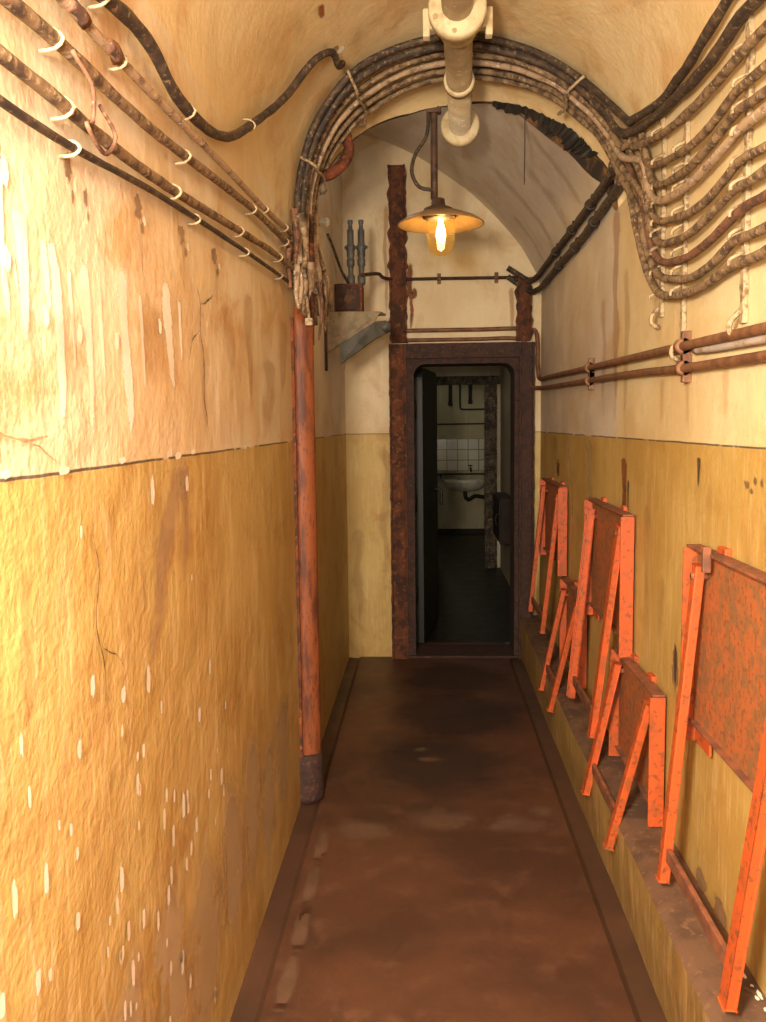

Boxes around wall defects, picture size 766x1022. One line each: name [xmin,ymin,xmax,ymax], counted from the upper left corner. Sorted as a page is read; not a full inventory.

leakage [0,209,29,341]
leakage [40,240,146,436]
leakage [158,280,182,389]
crack [0,432,57,462]
peeling [136,743,145,797]
peeling [163,787,198,871]
peeling [109,866,124,925]
peeling [142,866,173,948]
peeling [36,967,52,996]
peeling [107,920,140,987]
peeling [170,950,192,989]